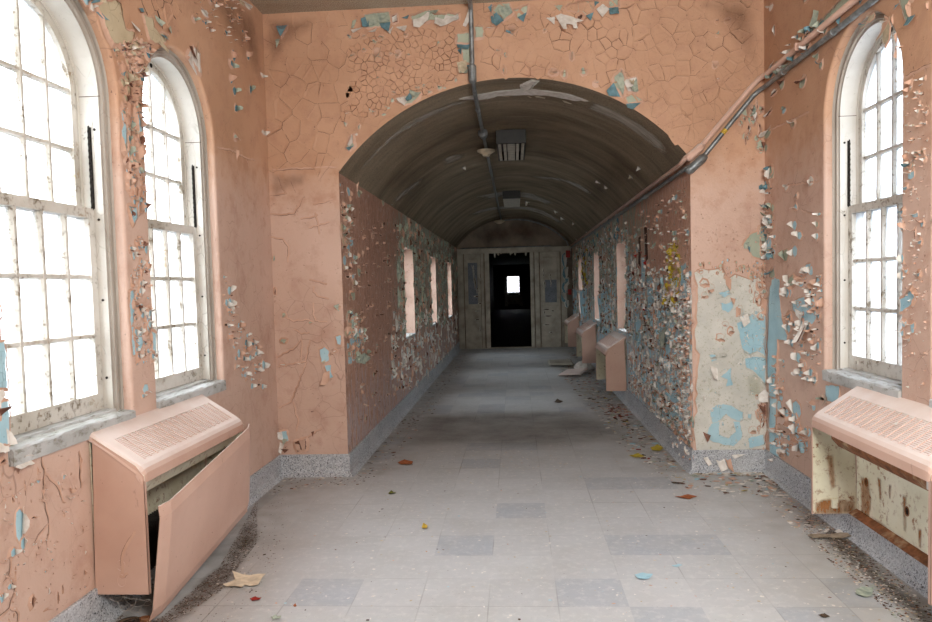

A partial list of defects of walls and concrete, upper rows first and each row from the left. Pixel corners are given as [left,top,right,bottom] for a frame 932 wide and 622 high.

peeling [82,0,172,366]
peeling [318,182,478,422]
peeling [347,2,530,116]
crack [263,0,764,262]
peeling [460,79,588,104]
peeling [542,0,621,33]
peeling [548,51,644,109]
peeling [545,163,841,486]
peeling [765,0,864,97]
peeling [858,0,915,59]
peeling [894,75,932,392]
peeling [0,332,88,622]